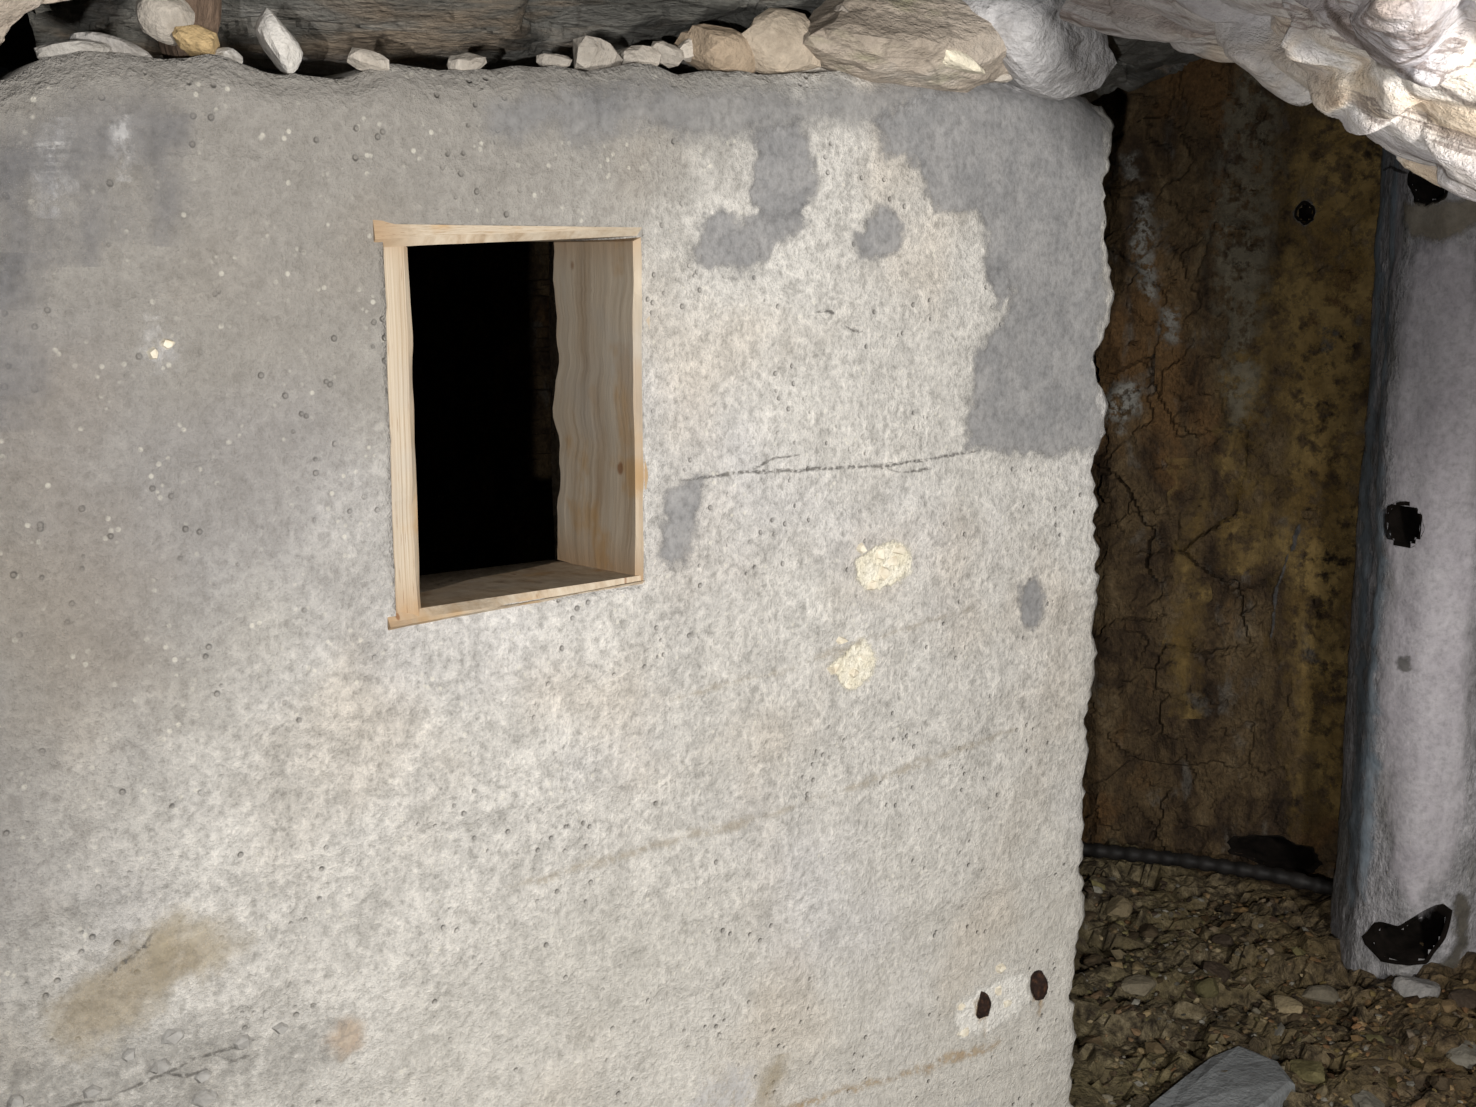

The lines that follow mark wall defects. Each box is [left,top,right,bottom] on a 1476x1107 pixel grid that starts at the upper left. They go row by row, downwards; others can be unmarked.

spalling [1407,171,1450,207]
water stain [493,82,1108,458]
crack [684,452,972,481]
spalling [1383,500,1425,548]
spalling [1361,899,1454,967]